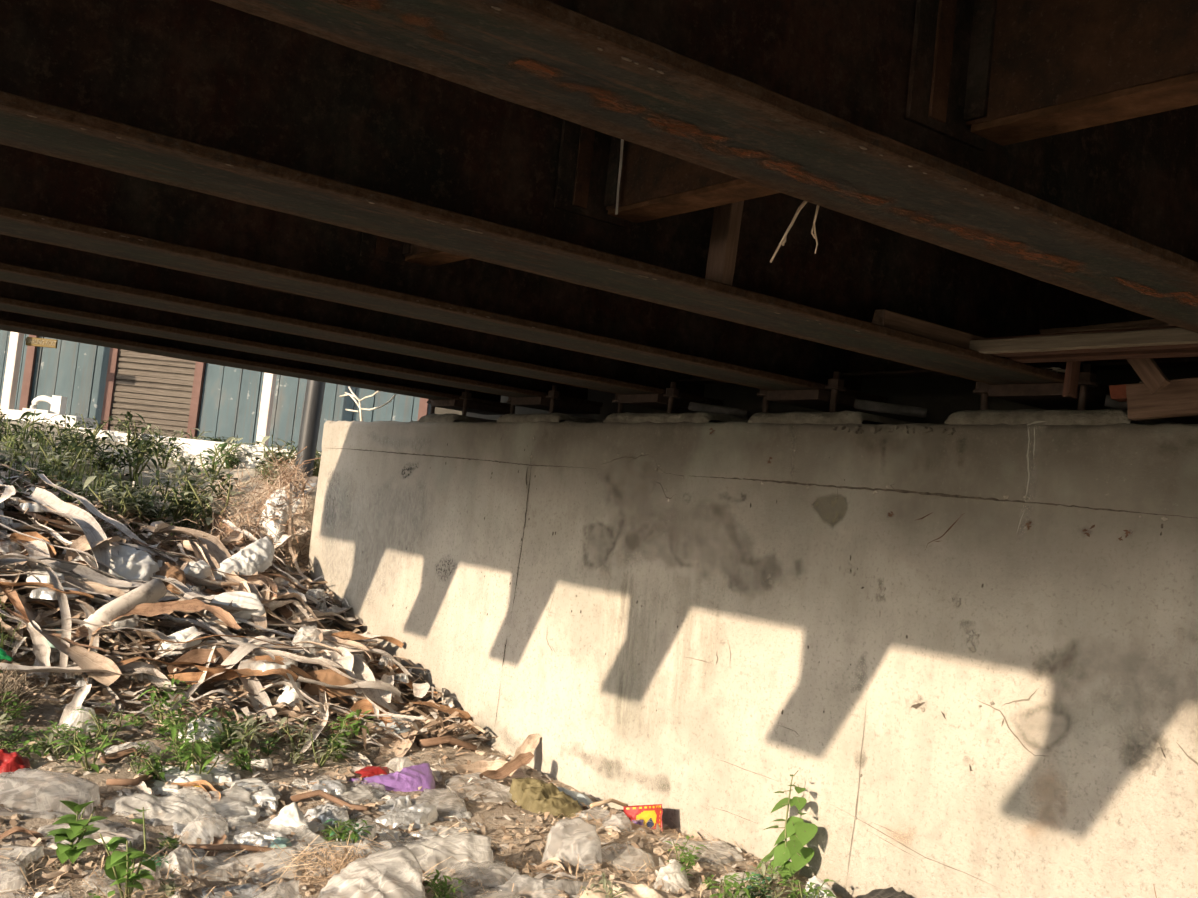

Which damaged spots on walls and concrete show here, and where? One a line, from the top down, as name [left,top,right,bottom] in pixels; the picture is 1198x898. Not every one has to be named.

rust [510,59,1084,272]
crack [335,437,1193,721]
damp [813,495,847,526]
crack [978,691,1044,756]